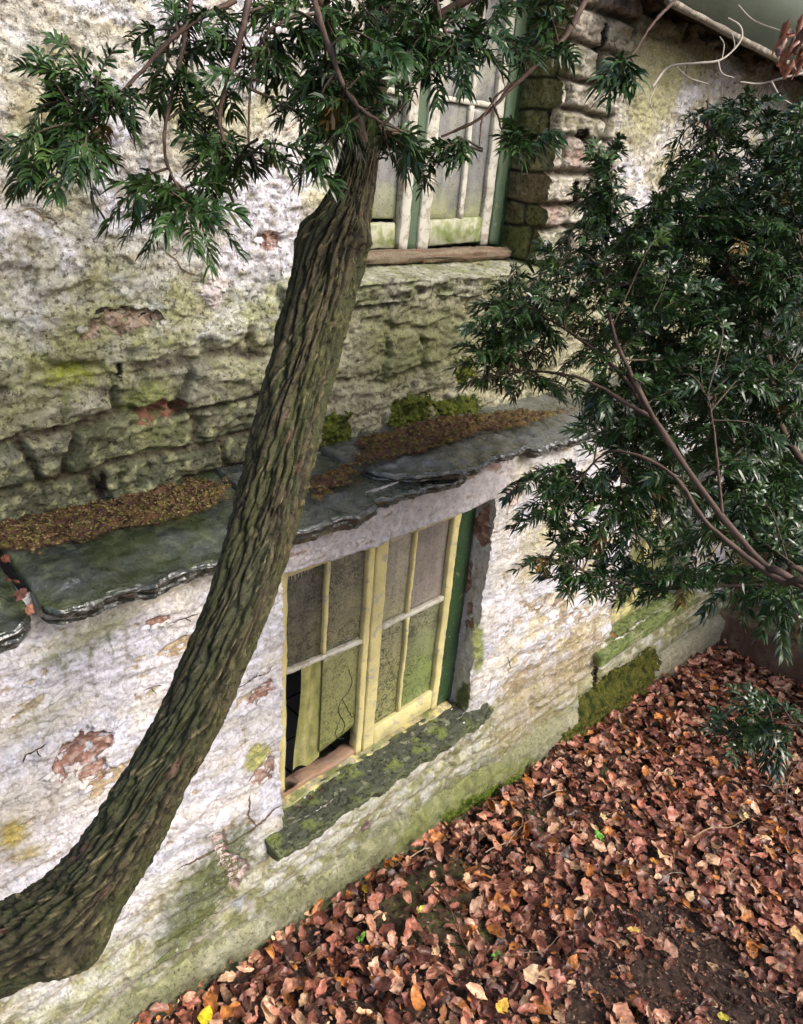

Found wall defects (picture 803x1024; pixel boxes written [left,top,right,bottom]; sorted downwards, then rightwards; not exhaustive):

flaking render [253,230,285,250]
flaking render [75,304,166,342]
peeling [247,678,275,706]
flaking render [38,726,131,800]
leakage [154,825,251,968]